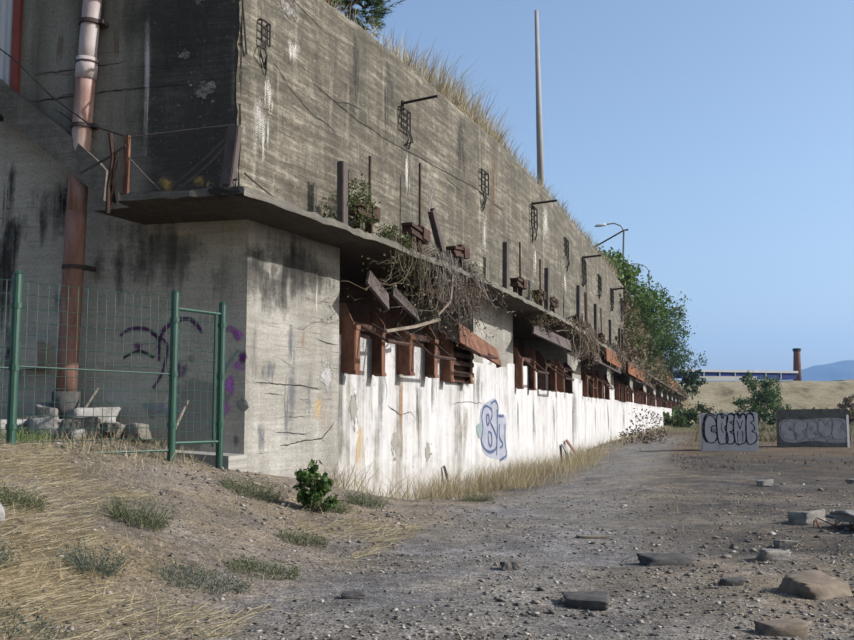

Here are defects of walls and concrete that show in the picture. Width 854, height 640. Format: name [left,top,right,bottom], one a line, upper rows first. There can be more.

spalling [189,81,219,103]
leakage [0,219,19,320]
leakage [245,253,300,301]
crack [256,382,334,446]